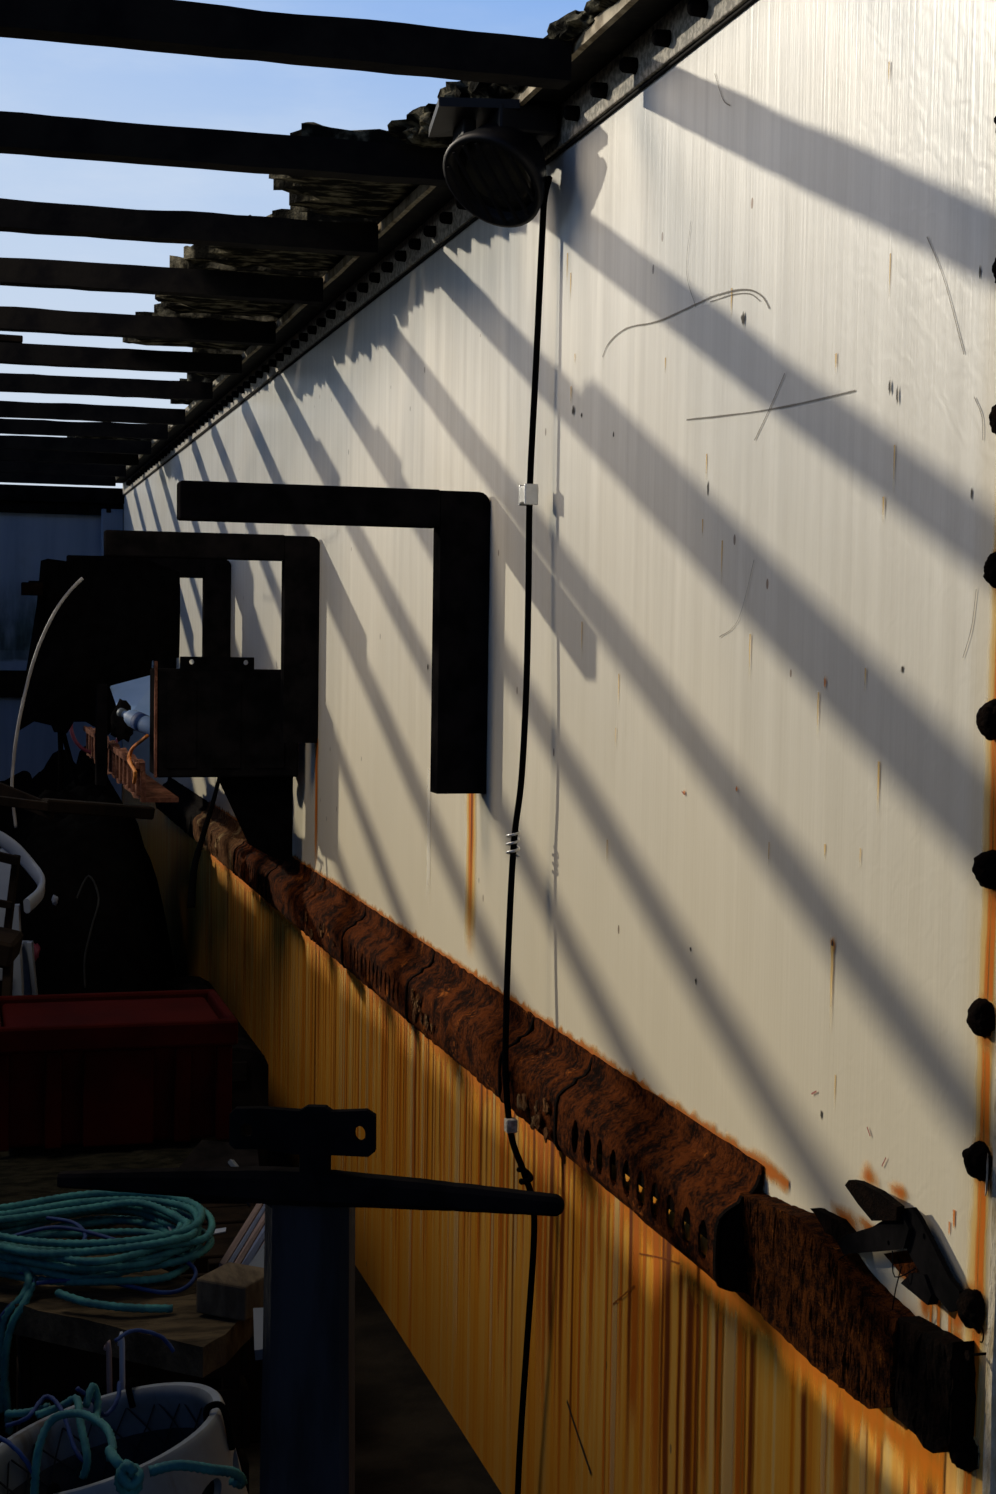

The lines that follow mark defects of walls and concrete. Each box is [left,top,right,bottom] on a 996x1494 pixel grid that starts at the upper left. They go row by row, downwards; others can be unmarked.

rust [292,743,789,1191]
rust [210,839,989,1494]